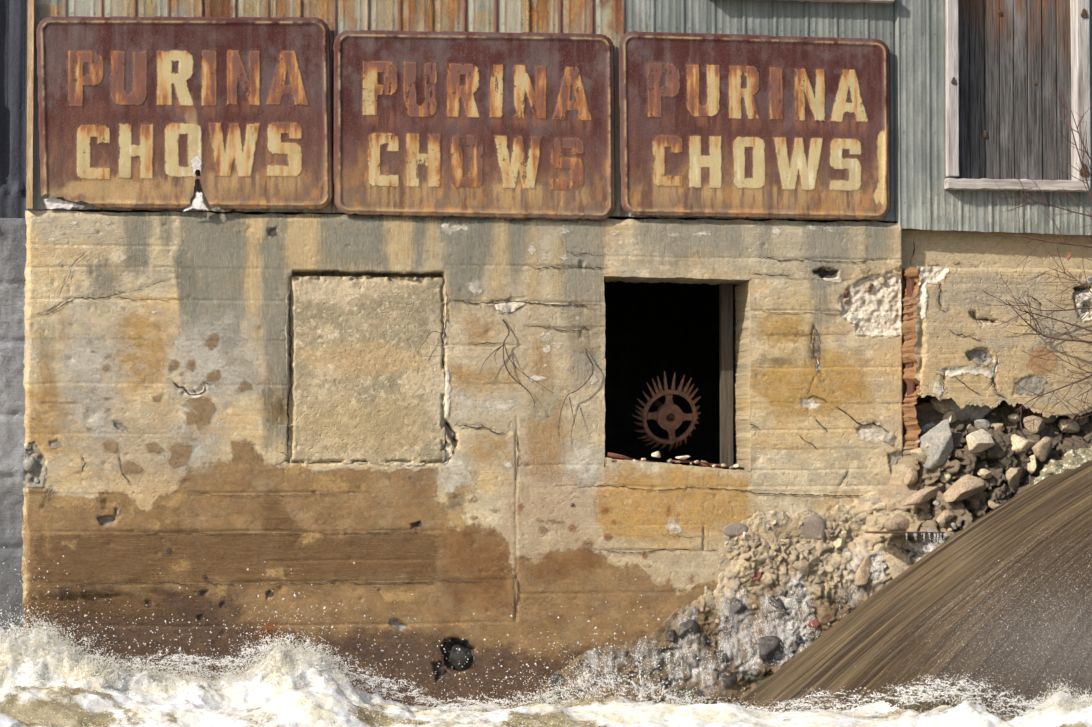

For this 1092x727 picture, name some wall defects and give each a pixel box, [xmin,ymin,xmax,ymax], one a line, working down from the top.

rust [194,0,232,17]
rust [268,0,353,30]
rust [379,0,459,31]
rust [523,0,548,33]
rust [599,0,624,38]
crack [26,253,177,320]
spalling [812,268,902,338]
spalling [916,259,976,320]
spalling [932,349,999,397]
spalling [1014,375,1046,395]
leakage [23,212,718,708]
spalling [98,502,135,526]